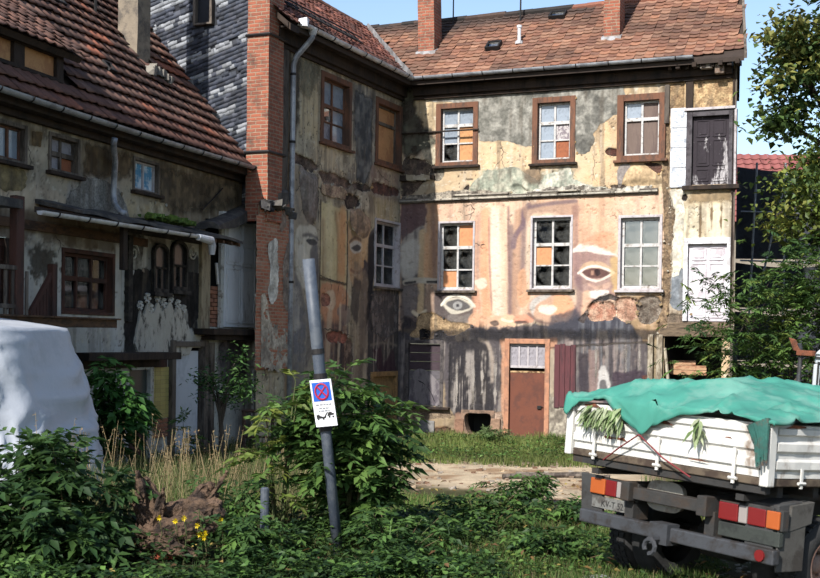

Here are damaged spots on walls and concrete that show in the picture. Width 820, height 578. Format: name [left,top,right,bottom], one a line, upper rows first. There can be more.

peeling [420,86,625,154]
spalling [694,79,733,108]
peeling [295,141,652,210]
spalling [578,82,696,334]
flaking render [254,204,290,373]
leakage [424,329,659,341]
leakage [472,367,484,402]